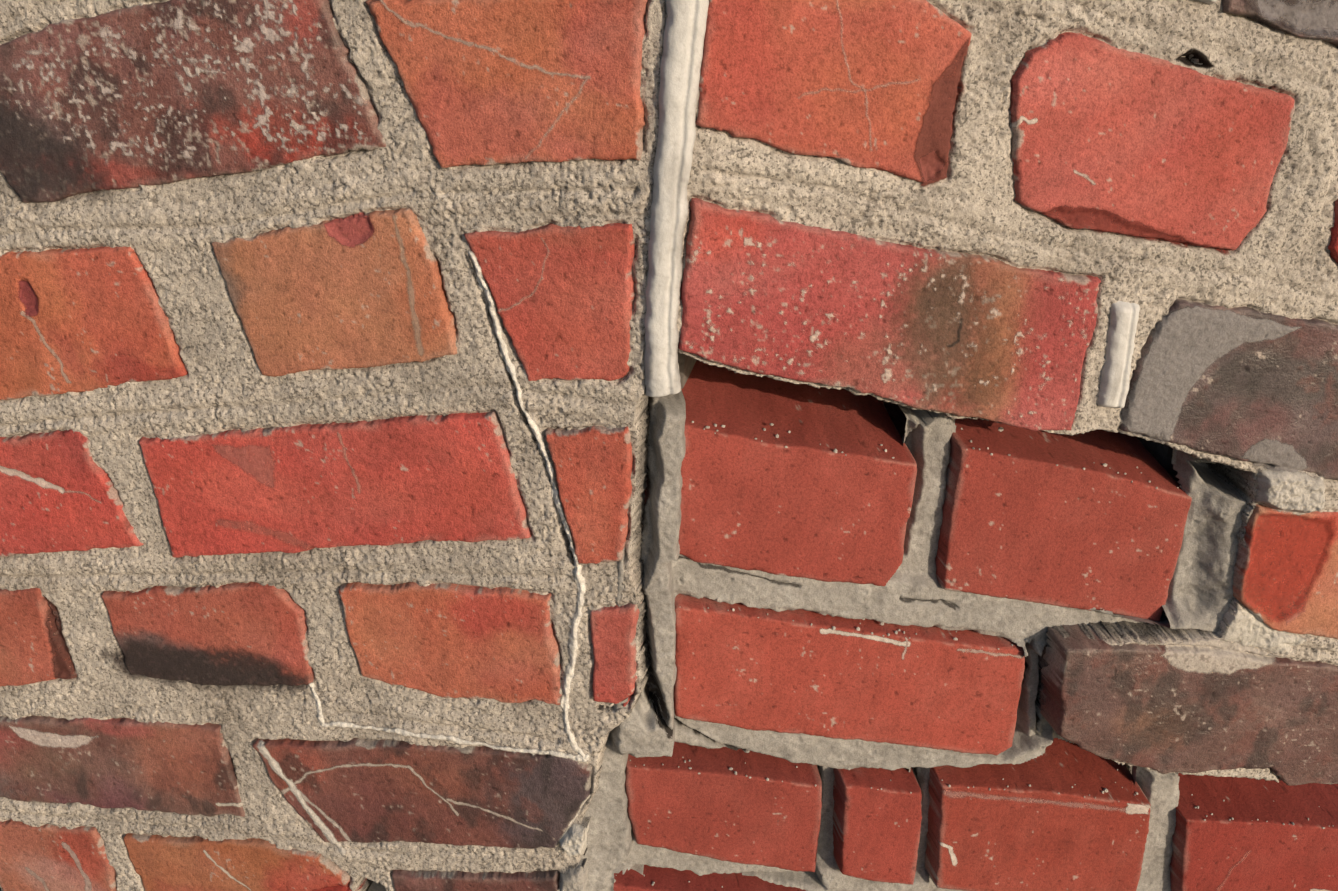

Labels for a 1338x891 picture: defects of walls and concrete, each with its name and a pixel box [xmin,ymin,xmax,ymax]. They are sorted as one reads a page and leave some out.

crack [282,251,746,848]